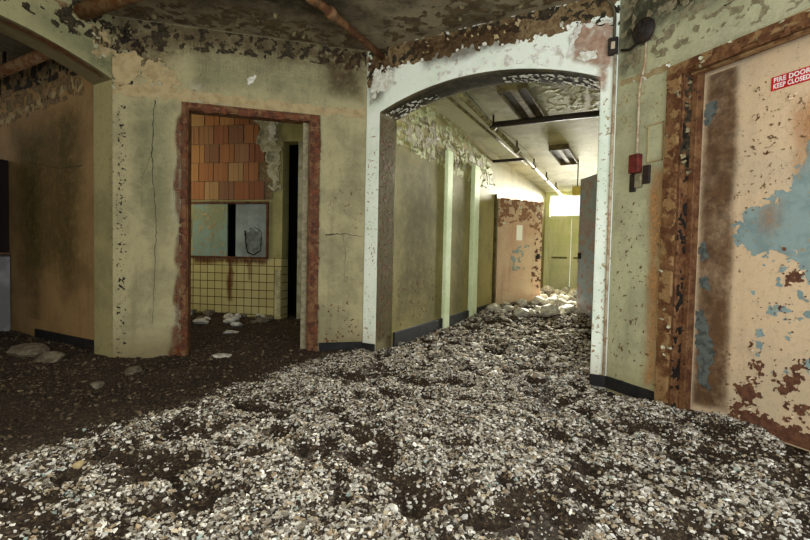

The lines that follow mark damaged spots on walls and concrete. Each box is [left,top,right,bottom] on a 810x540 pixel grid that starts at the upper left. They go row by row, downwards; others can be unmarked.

peeling [0,59,84,127]
corrosion [169,116,265,356]
corrosion [186,102,321,351]
peeling [88,0,770,375]
corrosion [648,10,810,407]
peeling [730,81,810,287]
peeling [751,290,810,357]